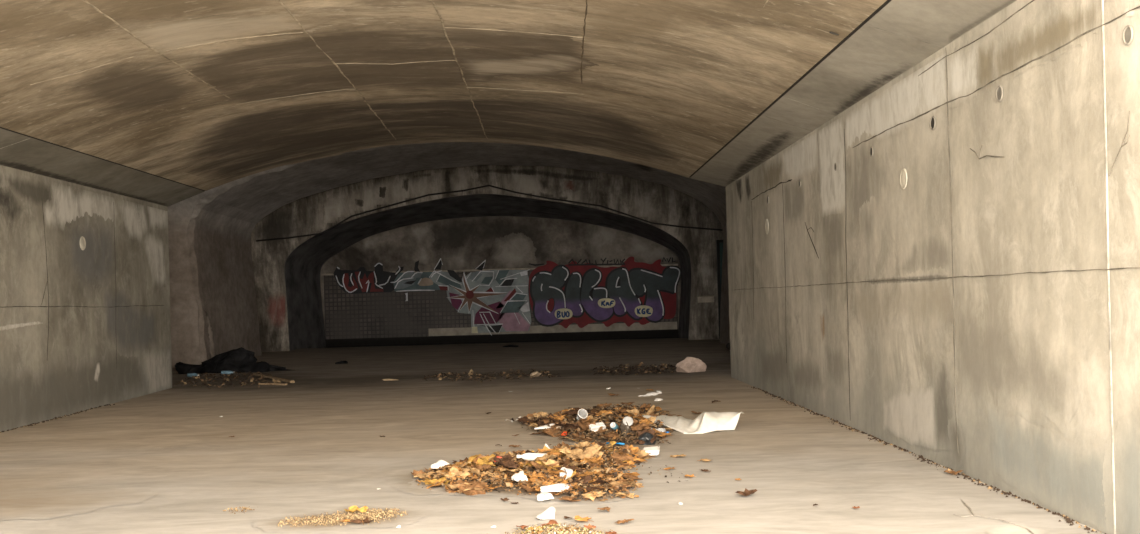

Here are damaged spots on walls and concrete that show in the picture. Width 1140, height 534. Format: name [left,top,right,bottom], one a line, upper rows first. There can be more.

crack [12,203,87,357]
leakage [0,160,172,432]
crack [737,0,1140,455]